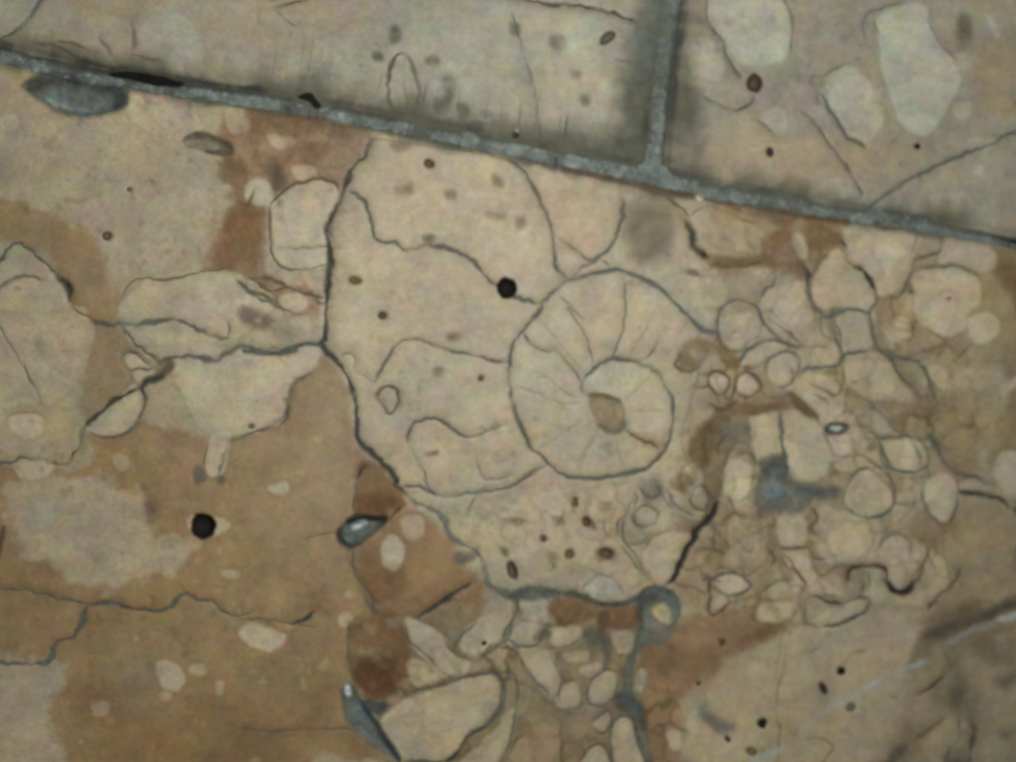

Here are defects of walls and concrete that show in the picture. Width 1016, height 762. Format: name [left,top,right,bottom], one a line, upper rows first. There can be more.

crack [514,0,634,36]
damp [567,169,618,181]
damp [638,185,687,197]
crack [821,94,879,203]
crack [903,131,1016,183]
crack [660,193,760,267]
crack [857,267,906,299]
crack [0,150,481,556]
crack [674,285,937,411]
crack [708,426,1008,627]
crack [0,594,260,666]
crack [406,485,718,762]